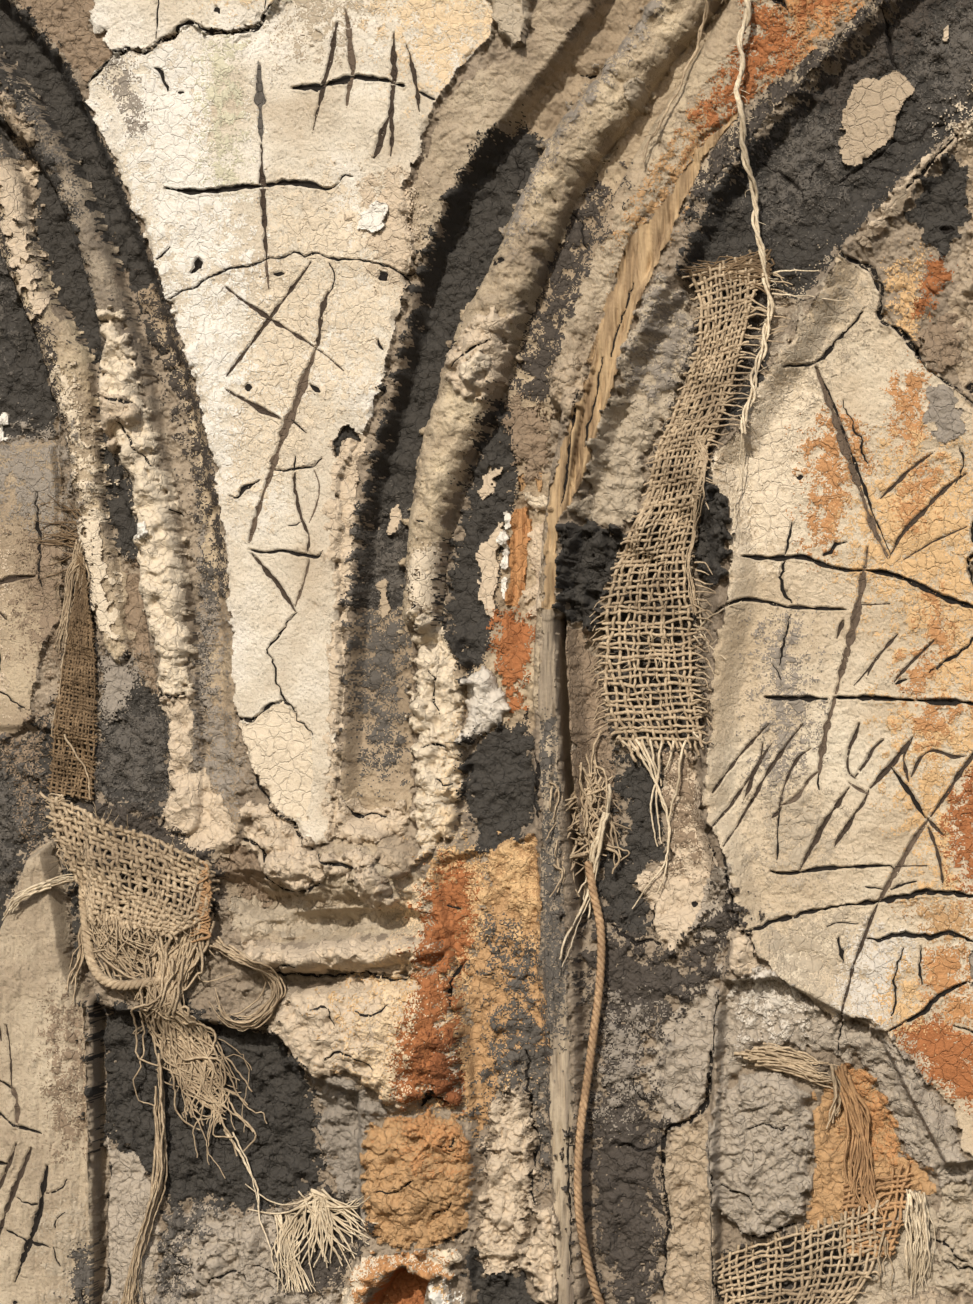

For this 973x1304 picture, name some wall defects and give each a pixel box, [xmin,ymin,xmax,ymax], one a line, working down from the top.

crack [87,0,274,88]
corrosion [600,0,871,275]
peeling [838,71,915,166]
crack [170,251,416,300]
crack [783,249,973,403]
spalling [856,77,973,443]
crack [772,522,792,680]
corrosion [784,237,973,1115]
corrosion [297,690,491,1209]
crack [708,844,973,1033]
corrosion [497,1061,544,1094]
corrosion [349,1246,457,1304]